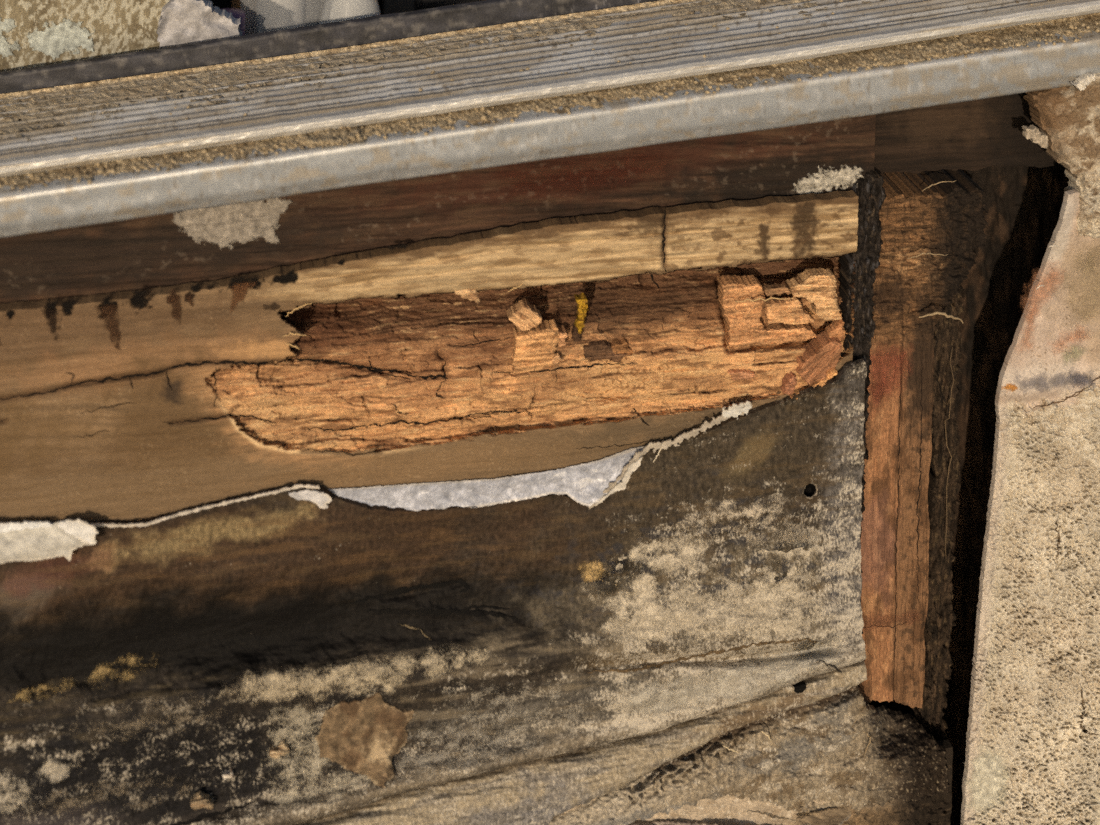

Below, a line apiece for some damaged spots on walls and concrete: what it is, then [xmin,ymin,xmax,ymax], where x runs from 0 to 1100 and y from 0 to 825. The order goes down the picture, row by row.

leakage [130,284,214,319]
leakage [229,271,298,310]
crack [0,331,530,456]
crack [494,362,635,384]
peeling [587,400,752,509]
peeling [90,484,332,528]
leakage [579,498,842,715]
peeling [315,691,414,788]
leakage [242,648,489,807]
leakage [395,684,584,773]
leakage [0,772,31,812]
leakage [39,758,160,815]